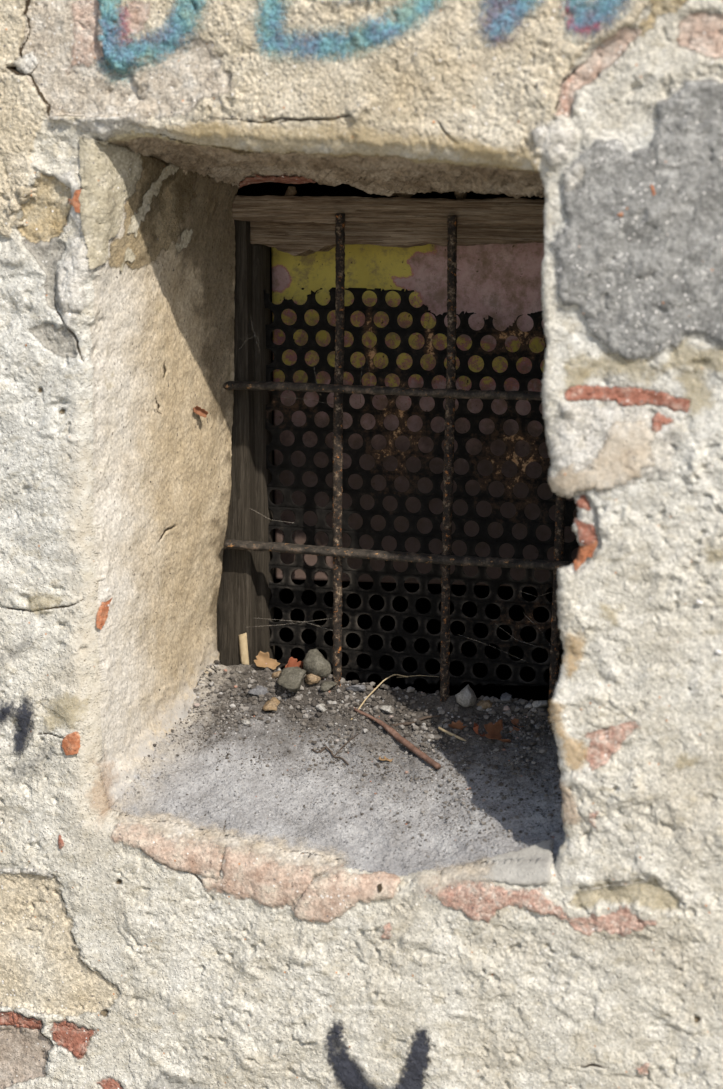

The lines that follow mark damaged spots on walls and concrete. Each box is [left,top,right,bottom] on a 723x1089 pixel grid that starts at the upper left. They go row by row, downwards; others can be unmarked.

crack [6,0,51,115]
flaking render [11,0,234,124]
flaking render [556,0,723,117]
crack [157,115,350,154]
flaking render [548,385,690,574]
flaking render [111,812,401,923]
flaking render [417,860,657,937]
flaking render [0,868,122,1089]